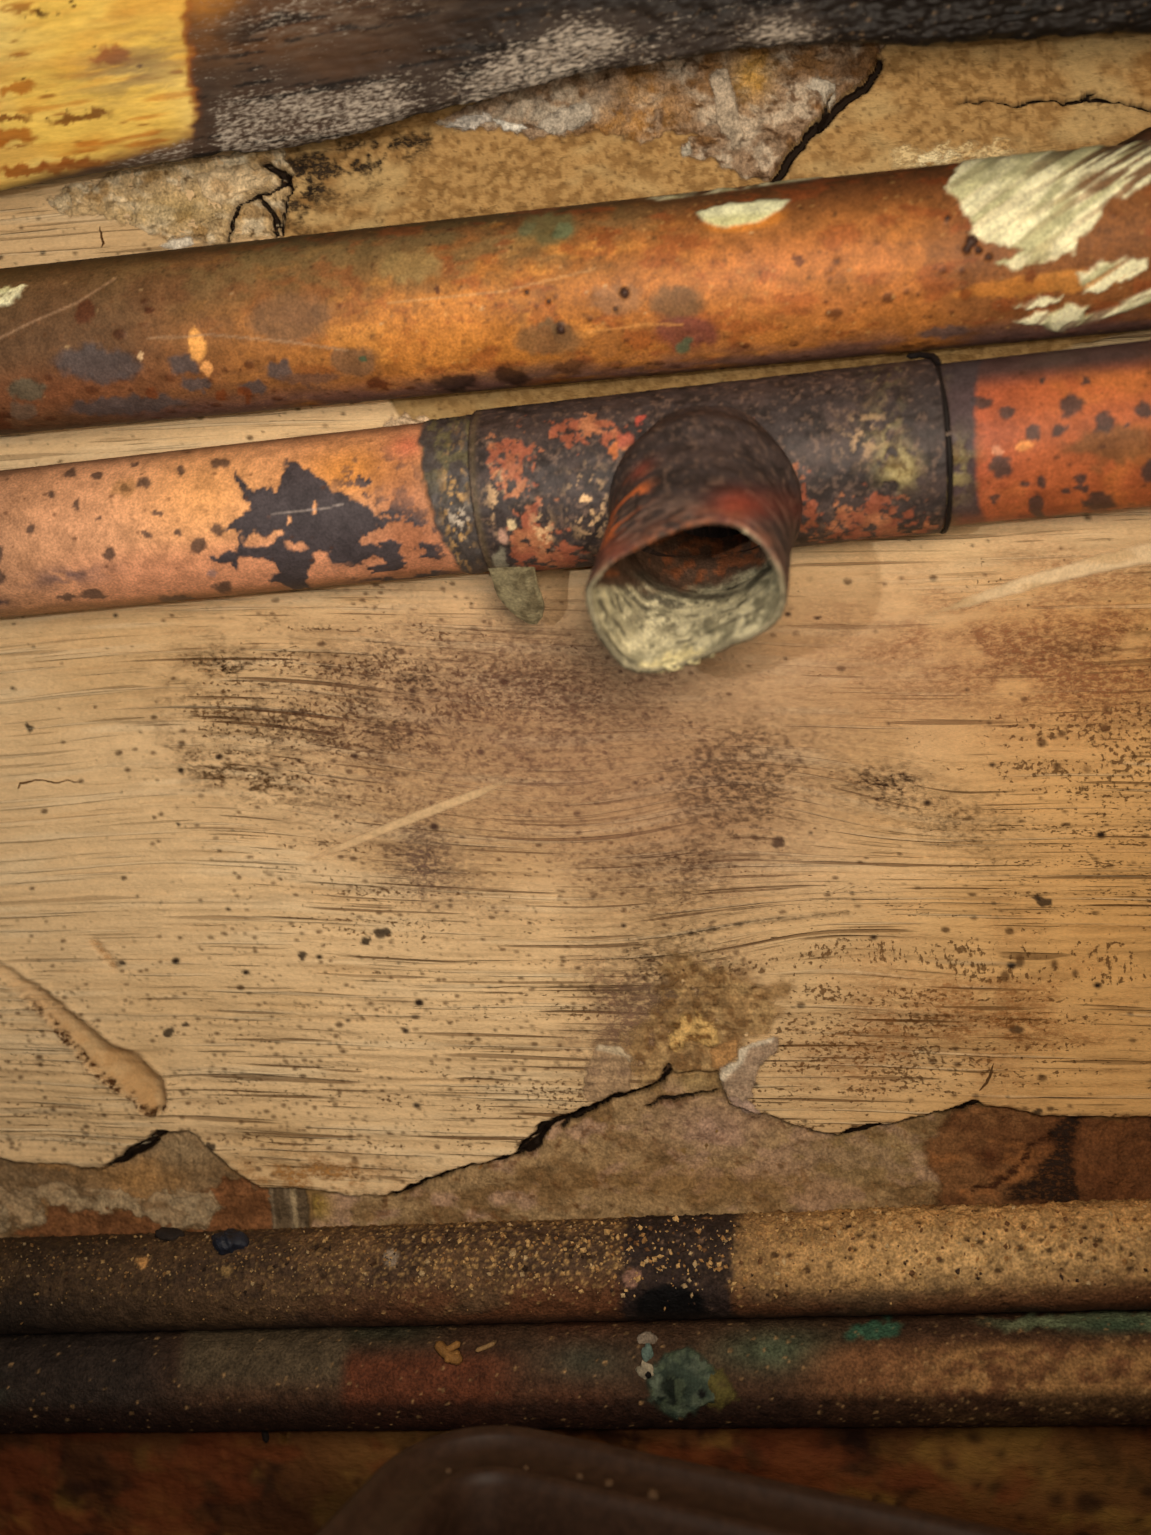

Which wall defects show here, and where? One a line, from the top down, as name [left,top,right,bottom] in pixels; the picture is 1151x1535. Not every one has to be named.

spalling [436,42,885,181]
crack [771,62,883,183]
spalling [47,148,294,249]
crack [228,164,294,241]
damp [198,763,293,791]
damp [595,956,722,1047]
spalling [34,1002,166,1117]
spalling [0,1130,273,1240]
crack [109,1130,169,1165]
crack [393,1066,716,1194]
spalling [311,953,1151,1227]